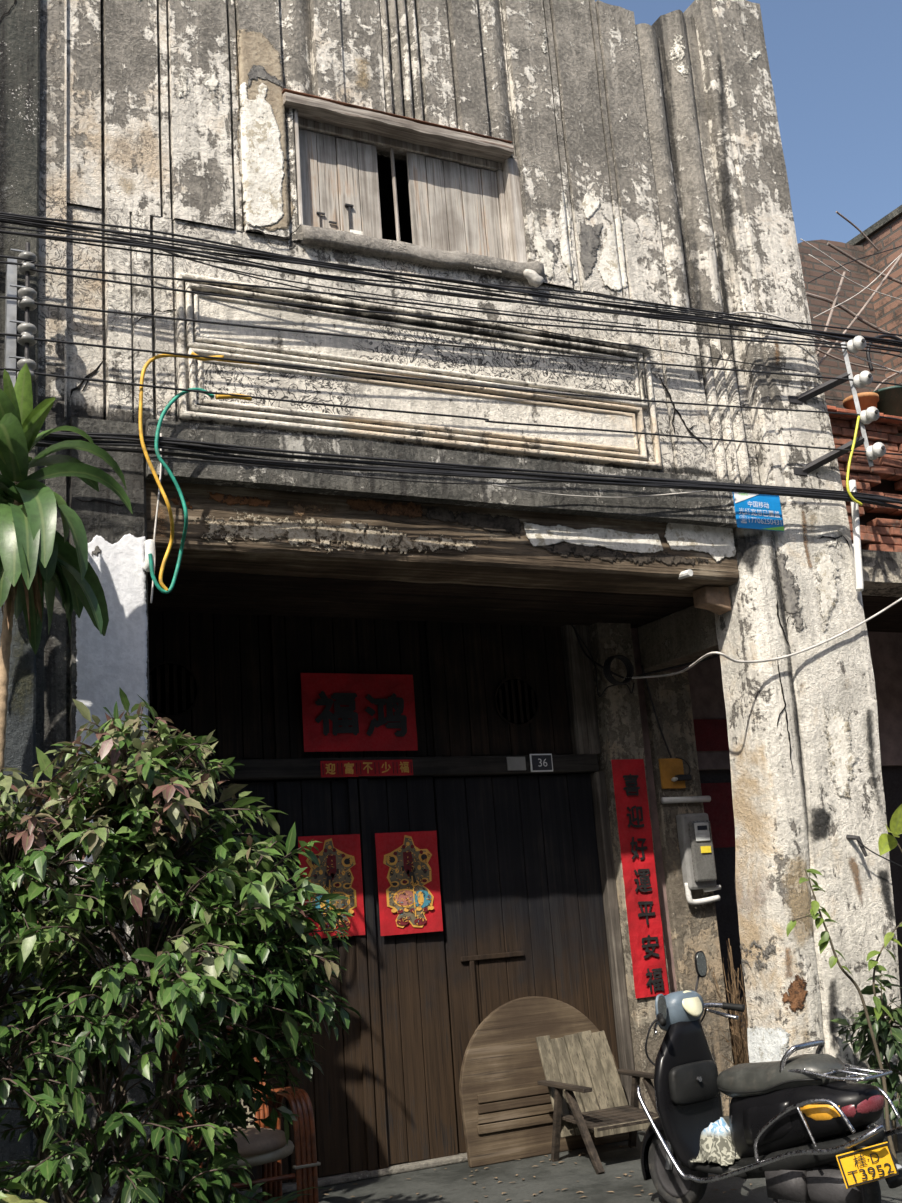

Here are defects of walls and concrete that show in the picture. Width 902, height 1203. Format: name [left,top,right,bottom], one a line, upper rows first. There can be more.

flaking render [171,29,295,231]
peeling [532,191,628,291]
damp [682,231,706,397]
damp [716,56,736,313]
crack [658,374,709,449]
flaking render [171,492,736,565]
crack [776,601,793,770]